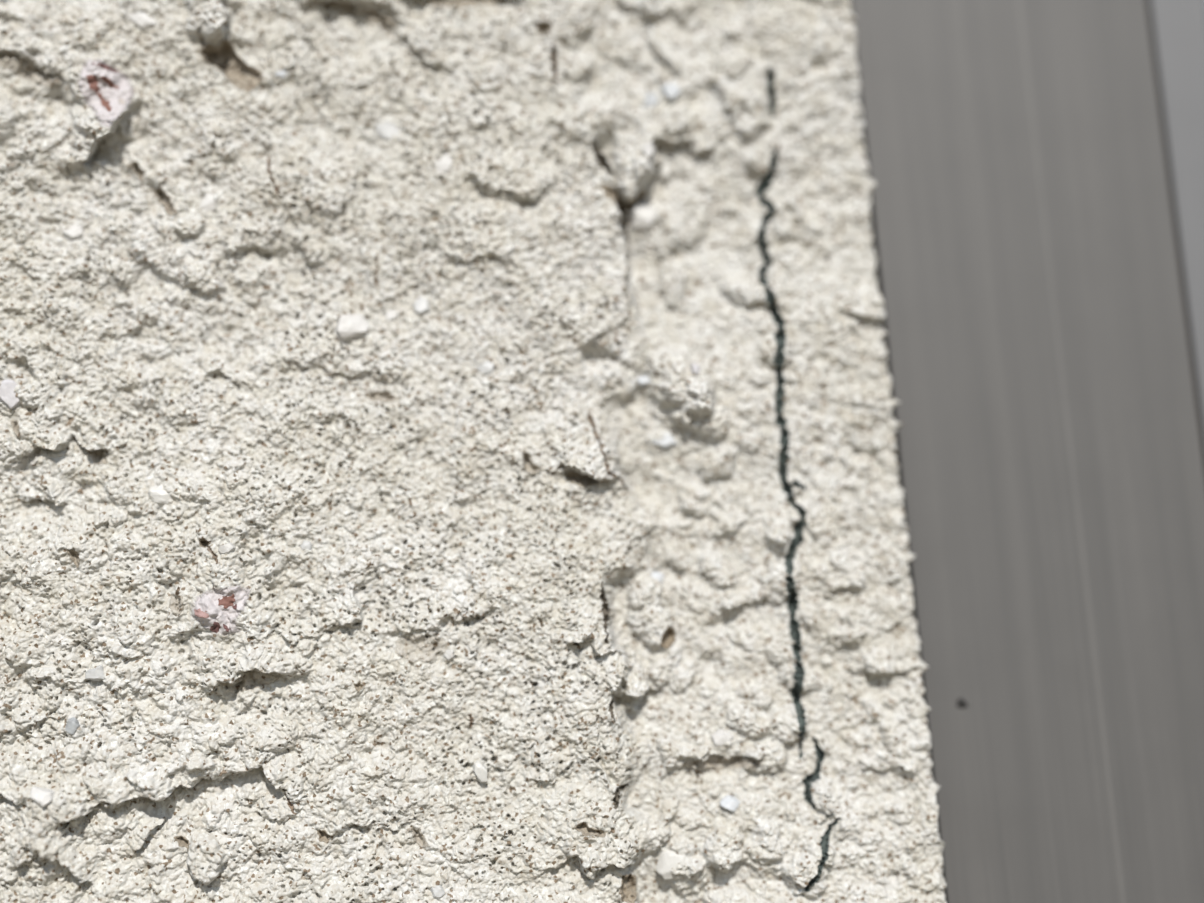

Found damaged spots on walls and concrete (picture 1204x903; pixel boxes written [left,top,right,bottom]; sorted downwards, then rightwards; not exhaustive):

crack [766,67,777,118]
crack [754,147,841,892]